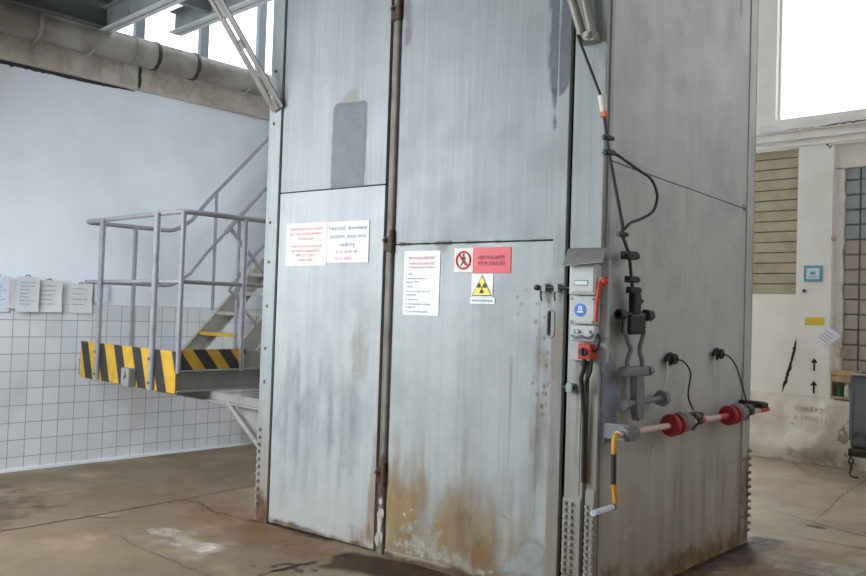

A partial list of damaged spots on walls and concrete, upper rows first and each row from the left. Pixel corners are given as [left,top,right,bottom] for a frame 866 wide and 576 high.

corrosion [367,455,493,576]
crack [754,480,866,549]
leakage [293,553,448,576]
leakage [672,537,781,576]